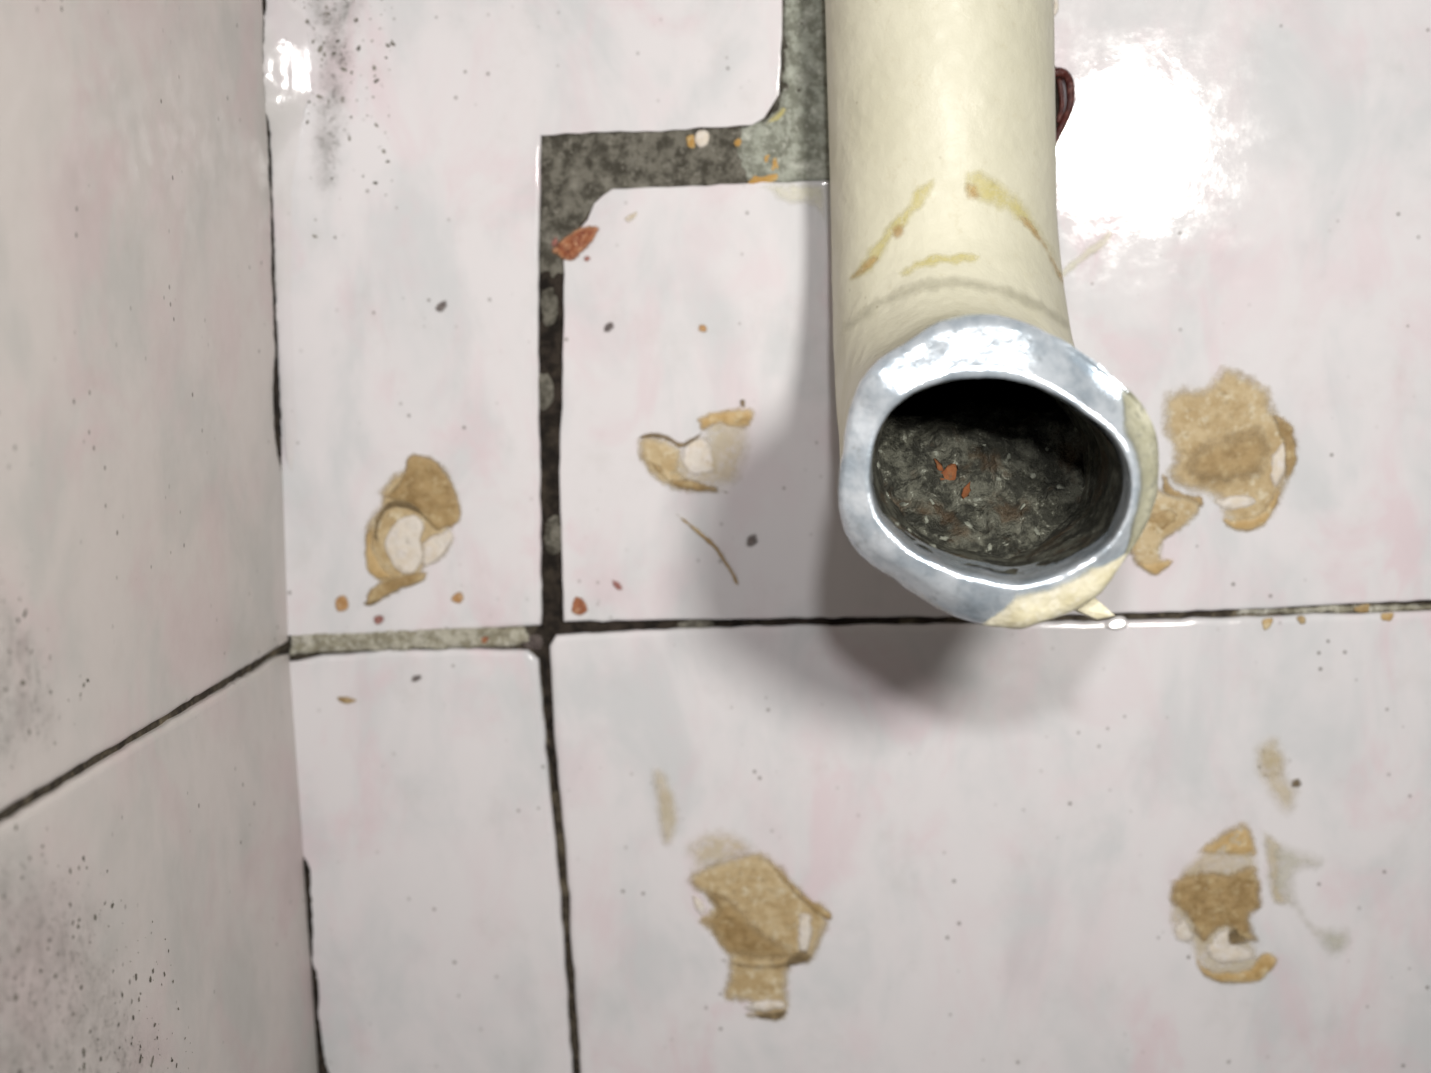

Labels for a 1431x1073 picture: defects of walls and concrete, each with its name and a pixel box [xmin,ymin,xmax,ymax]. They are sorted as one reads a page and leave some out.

leakage [293,0,396,179]
peeling [364,455,460,606]
peeling [640,400,753,491]
peeling [682,518,738,584]
peeling [1131,370,1297,574]
peeling [692,854,832,1020]
peeling [1171,825,1277,983]